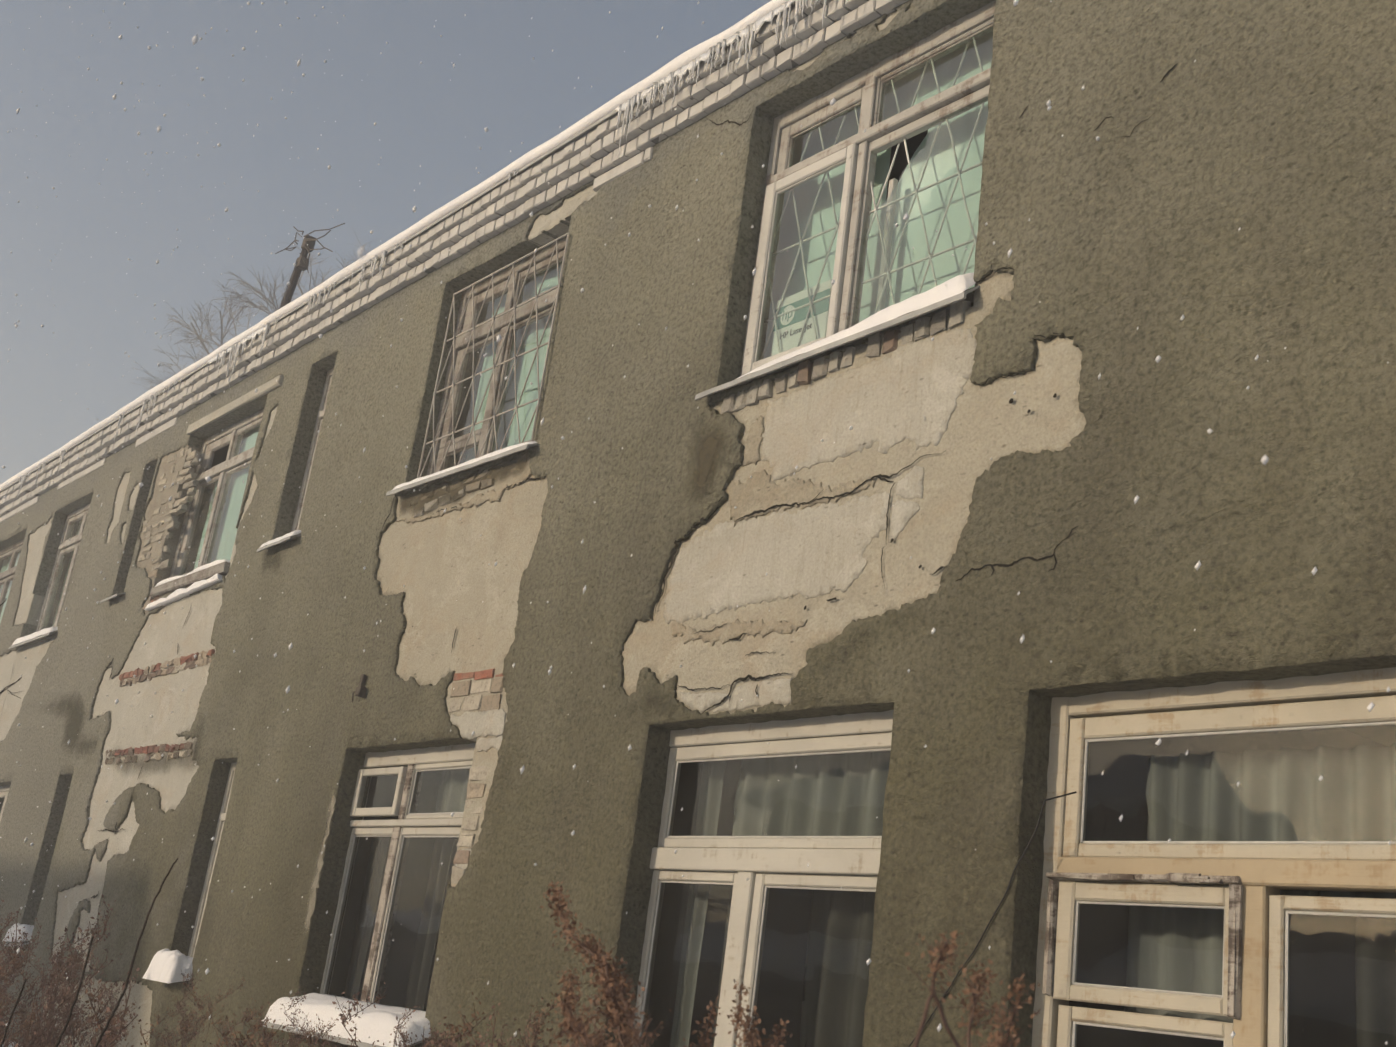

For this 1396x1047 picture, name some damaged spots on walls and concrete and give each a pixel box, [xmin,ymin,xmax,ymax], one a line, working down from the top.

flaking render [0,518,53,741]
flaking render [41,445,258,1047]
flaking render [260,407,277,455]
flaking render [377,452,548,887]
crack [678,622,793,715]
crack [655,451,945,613]
flaking render [622,271,1086,715]
crack [931,526,1078,581]